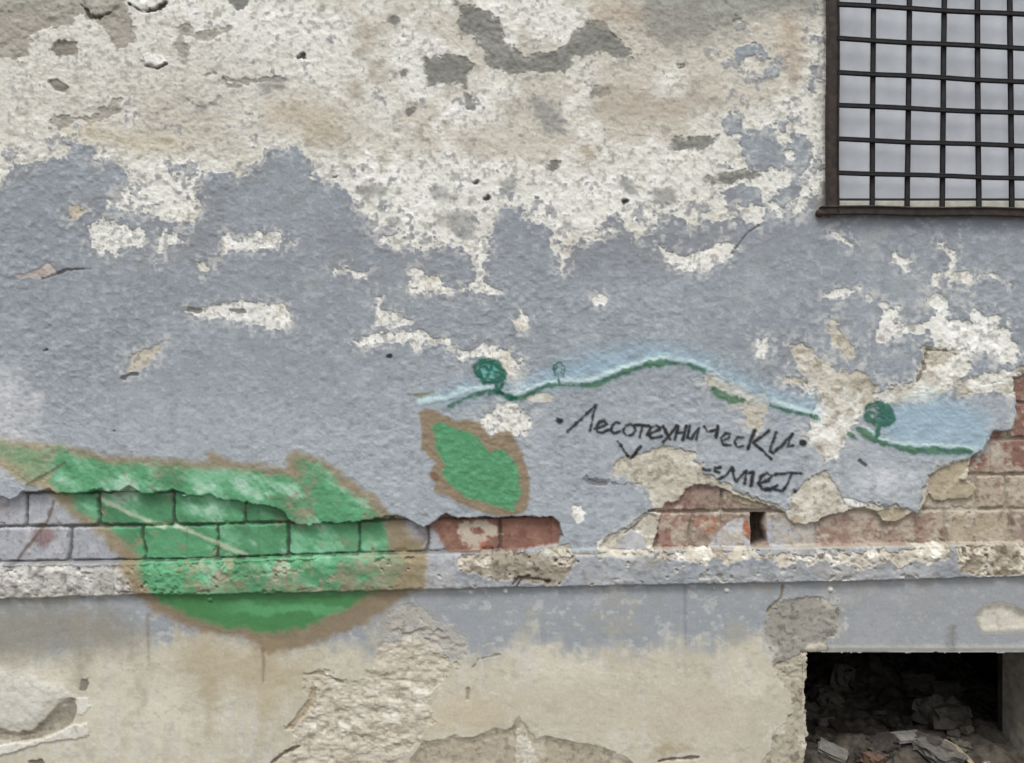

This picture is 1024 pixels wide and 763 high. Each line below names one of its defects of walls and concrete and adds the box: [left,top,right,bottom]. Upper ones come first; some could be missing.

peeling [0,0,826,295]
peeling [185,299,293,330]
spalling [596,241,1024,552]
spalling [0,491,120,565]
spalling [409,513,562,555]
peeling [571,505,586,524]
spalling [271,603,632,763]
spalling [762,585,841,763]
spalling [0,697,91,763]